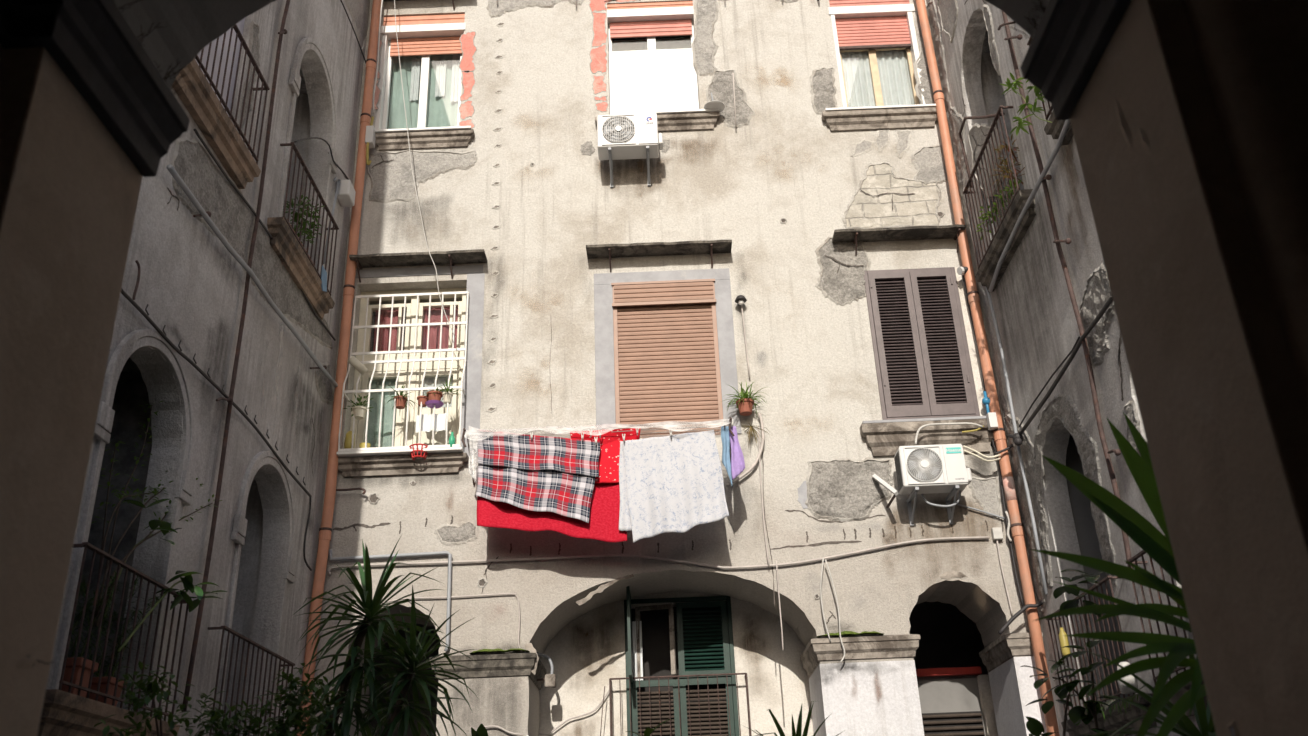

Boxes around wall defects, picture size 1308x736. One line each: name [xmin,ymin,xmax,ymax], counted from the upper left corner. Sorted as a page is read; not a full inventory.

flaking render [345,0,383,111]
peeling [459,31,477,129]
peeling [486,0,638,186]
flaking render [692,0,755,129]
flaking render [366,149,478,203]
flaking render [805,0,1102,613]
flaking render [1079,263,1115,369]
flaking render [1091,502,1117,586]